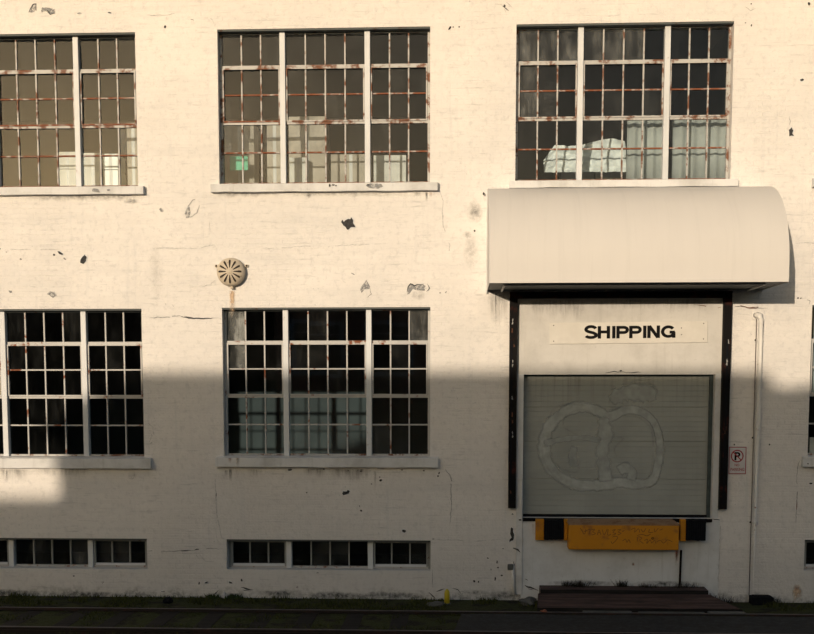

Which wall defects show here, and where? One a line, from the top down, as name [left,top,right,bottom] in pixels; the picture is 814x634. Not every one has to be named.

spalling [341,217,356,231]
crack [153,313,212,321]